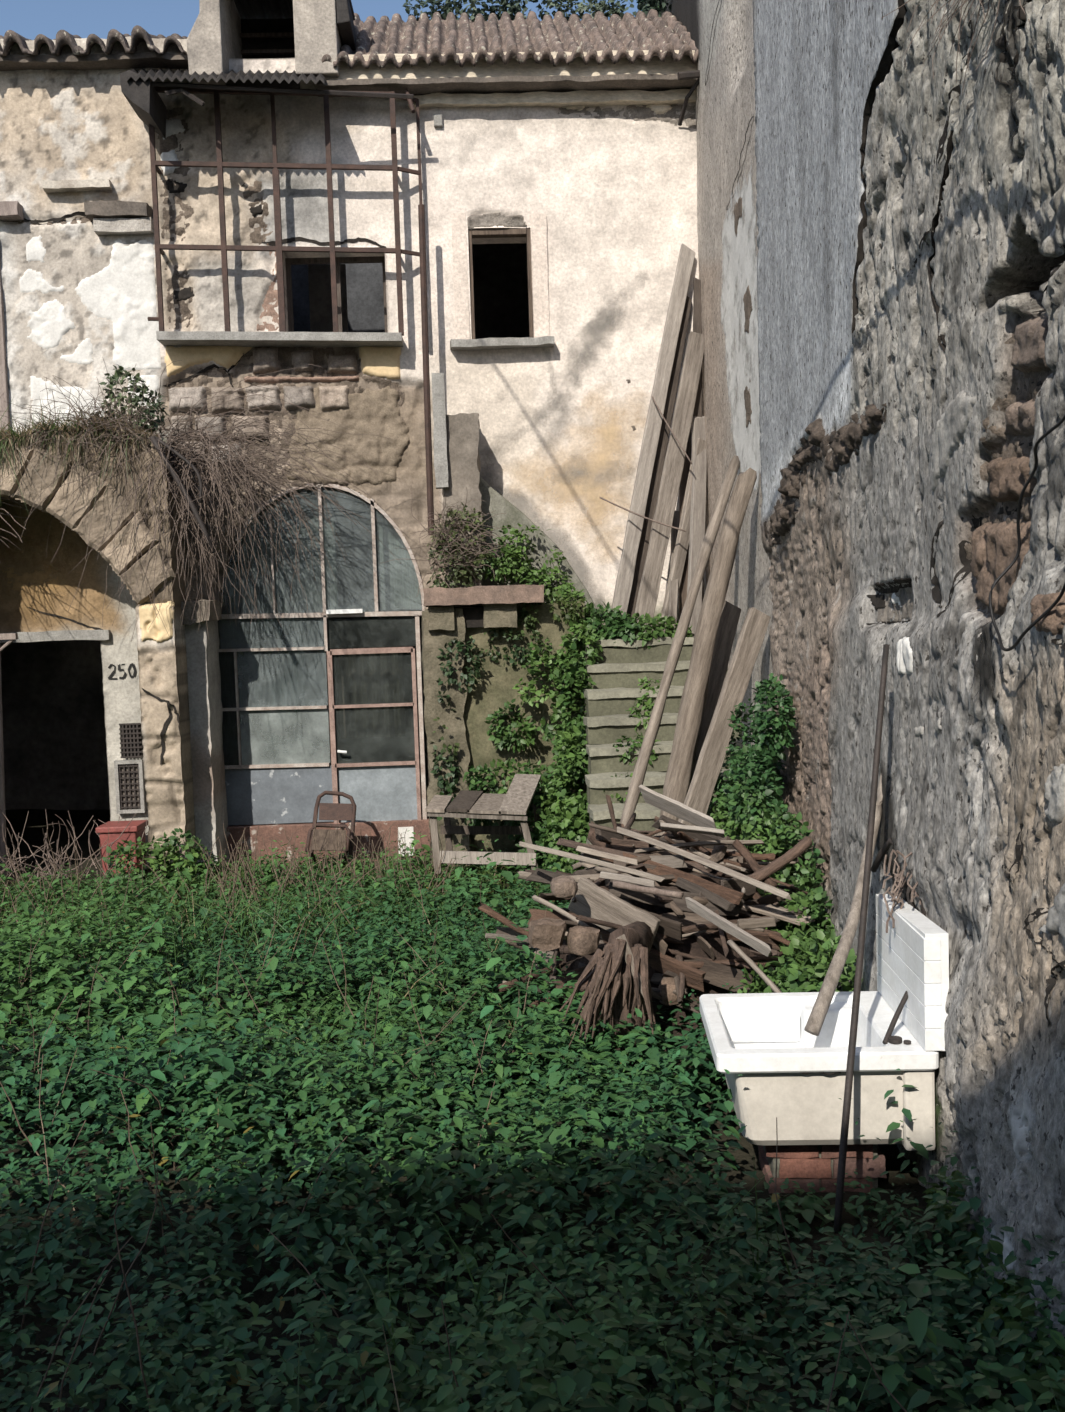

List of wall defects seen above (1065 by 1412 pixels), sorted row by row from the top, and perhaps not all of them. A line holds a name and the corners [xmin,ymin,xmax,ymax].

spalling [9,107,410,493]
crack [262,237,387,248]
peeling [720,167,762,490]
spalling [763,403,887,547]
crack [852,0,907,344]
spalling [931,287,1052,615]
crack [142,688,180,765]